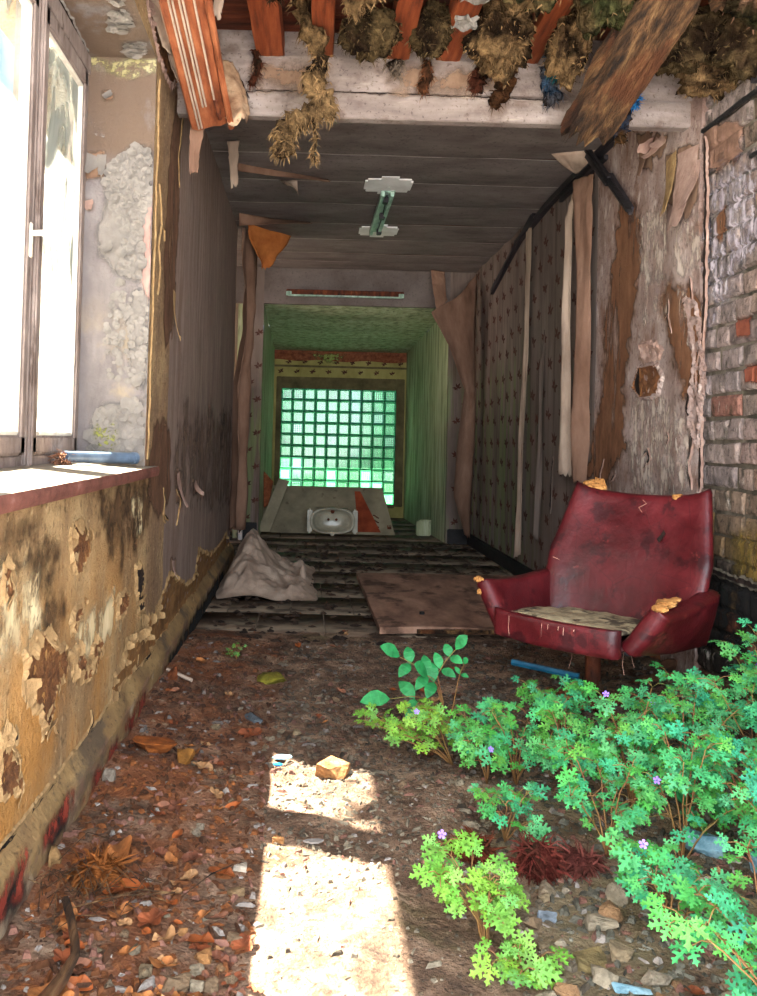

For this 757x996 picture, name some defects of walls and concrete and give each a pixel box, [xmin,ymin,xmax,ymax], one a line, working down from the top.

spalling [105,0,178,90]
flaking render [636,131,701,232]
peeling [141,197,152,298]
spalling [631,339,665,401]
water stain [99,399,231,571]
spalling [0,553,17,612]
water stain [0,521,66,652]
spalling [21,594,104,744]
spalling [68,517,94,581]
water stain [77,588,122,654]